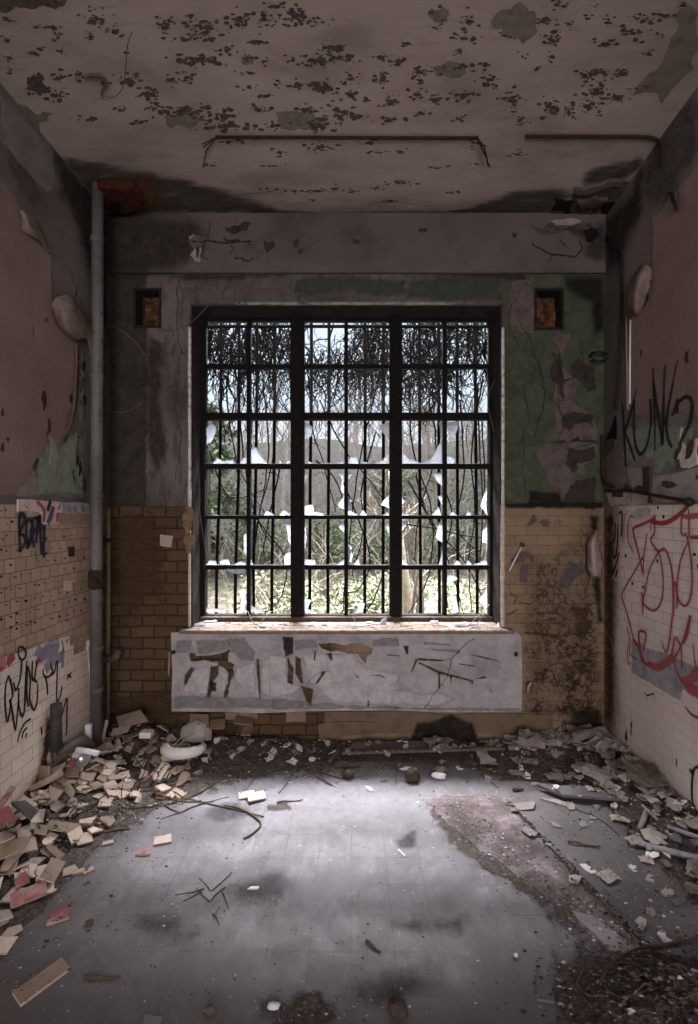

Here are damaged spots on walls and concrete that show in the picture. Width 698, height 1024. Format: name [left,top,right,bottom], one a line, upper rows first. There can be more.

peeling [0,0,698,192]
leakage [56,156,296,324]
peeling [189,221,275,262]
peeling [259,178,421,204]
crack [531,239,583,261]
peeling [37,434,86,496]
flaking render [530,333,698,518]
peeling [0,509,88,638]
crack [424,639,474,709]
leakage [506,491,615,731]